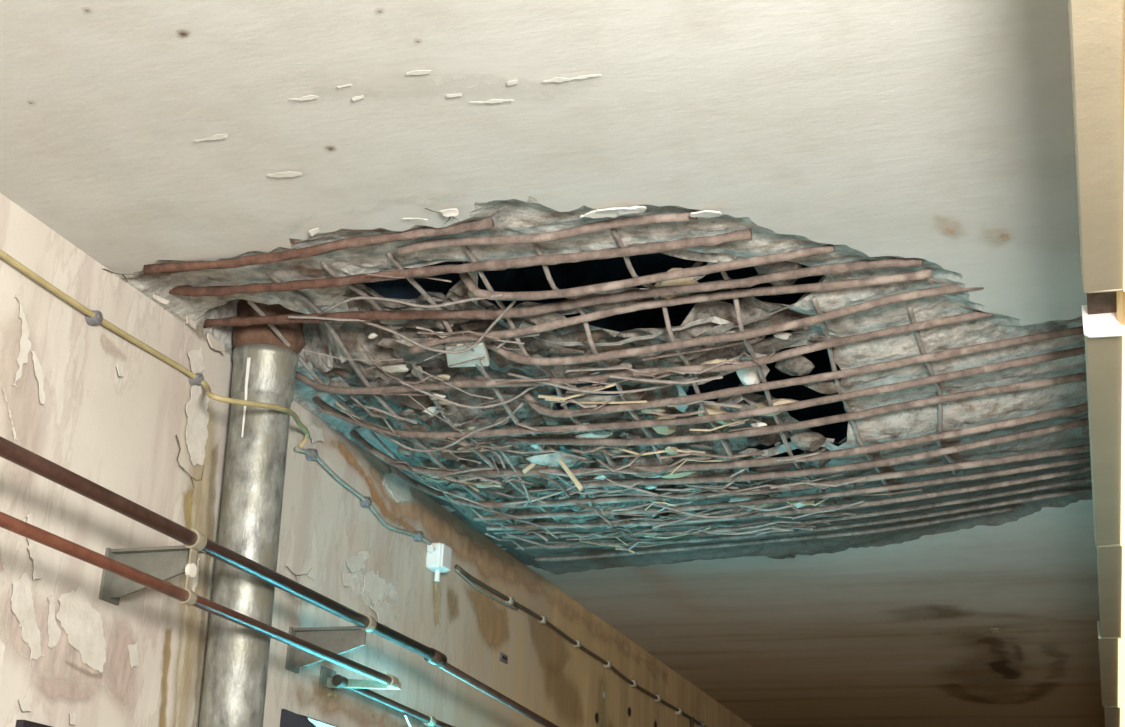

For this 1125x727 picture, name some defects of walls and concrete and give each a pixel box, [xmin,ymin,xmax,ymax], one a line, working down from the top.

peeling [2,294,45,452]
spalling [121,196,1092,575]
peeling [0,538,139,725]